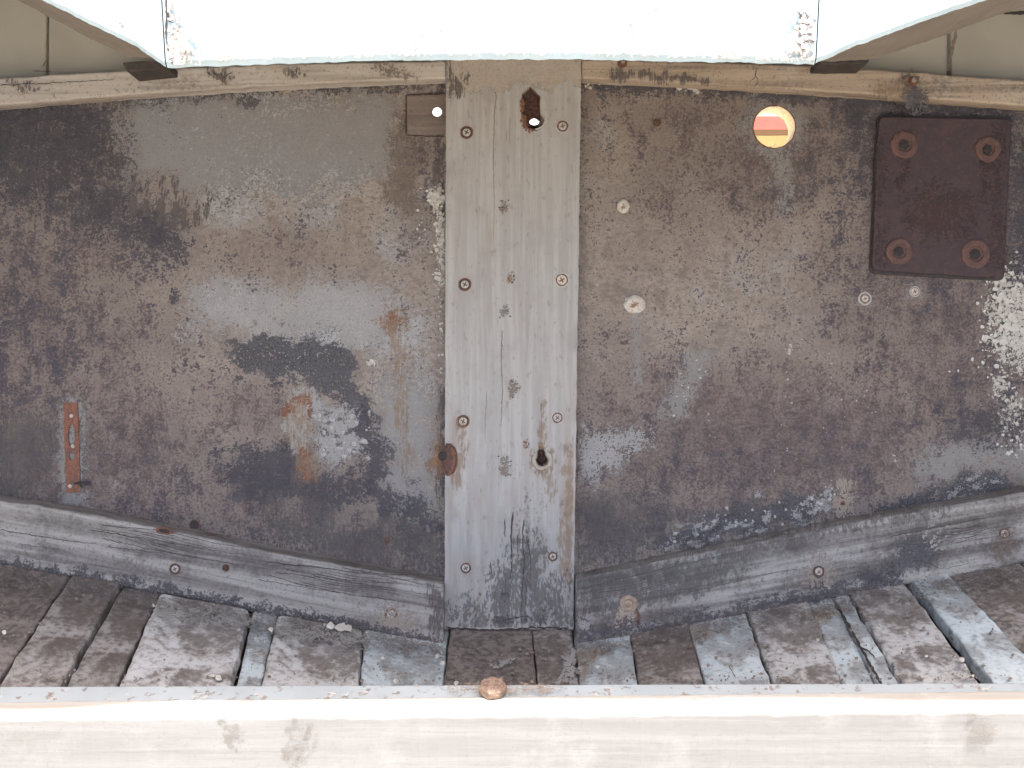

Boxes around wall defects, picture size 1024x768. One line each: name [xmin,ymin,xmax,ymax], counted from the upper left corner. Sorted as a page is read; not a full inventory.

leakage [0,50,551,275]
rust [519,98,534,133]
rust [63,403,91,493]
rust [276,385,330,482]
leakage [0,387,1024,658]
peeling [971,250,1024,462]